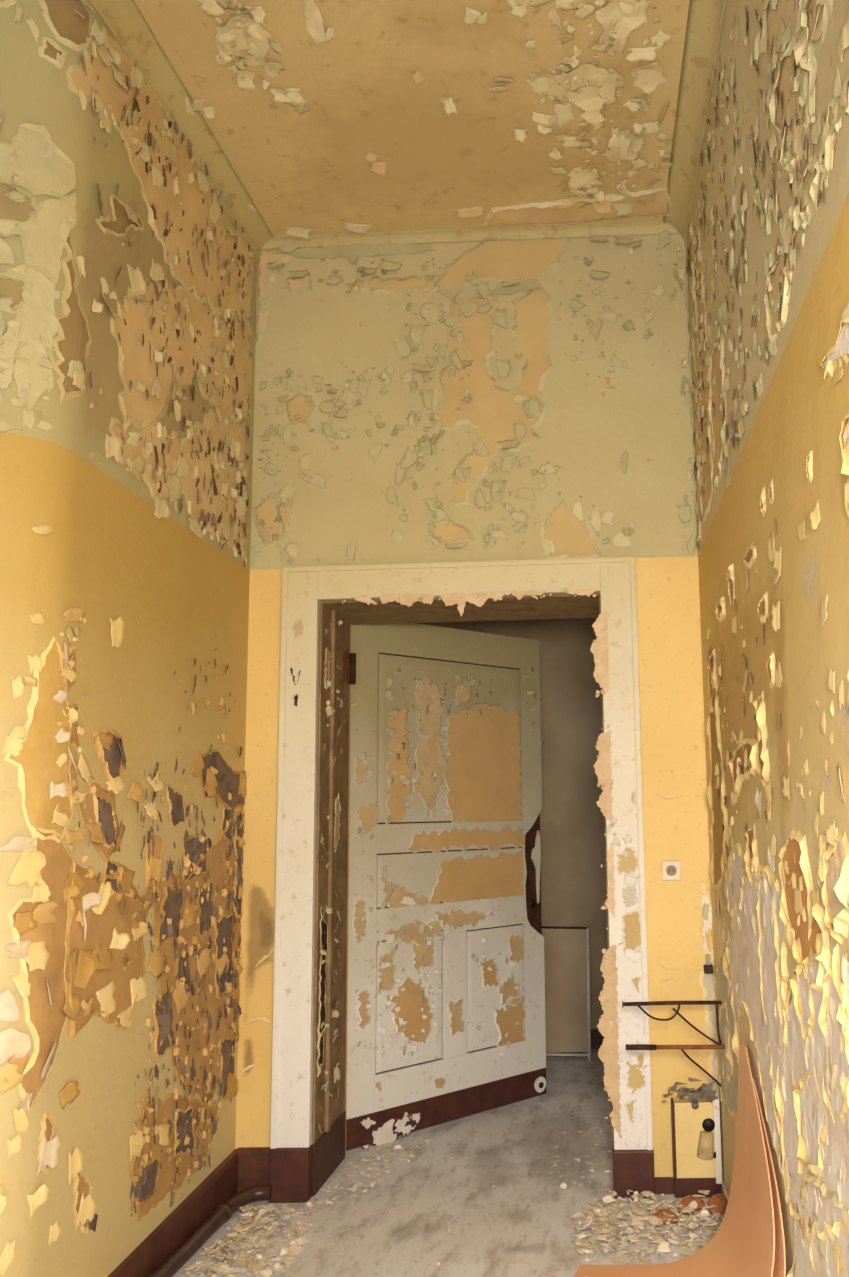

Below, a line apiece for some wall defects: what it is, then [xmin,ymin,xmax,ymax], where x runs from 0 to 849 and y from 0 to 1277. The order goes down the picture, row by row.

peeling [0,0,849,566]
peeling [342,588,596,617]
peeling [590,611,610,697]
peeling [0,608,247,1246]
peeling [316,620,544,1134]
peeling [593,720,648,1143]
peeling [0,1239,16,1277]